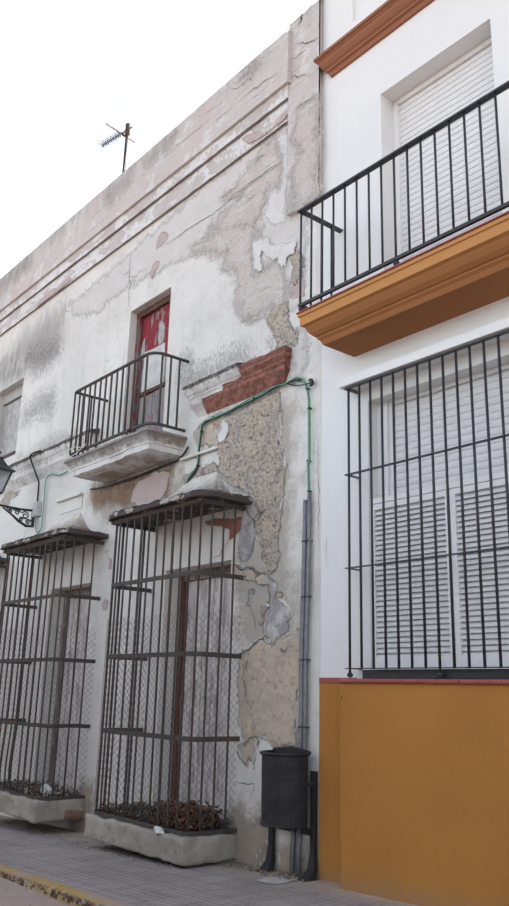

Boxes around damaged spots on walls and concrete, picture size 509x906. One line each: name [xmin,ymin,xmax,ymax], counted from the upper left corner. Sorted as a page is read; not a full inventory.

crack [234,14,319,99]
peeling [68,95,323,384]
spalling [183,391,300,770]